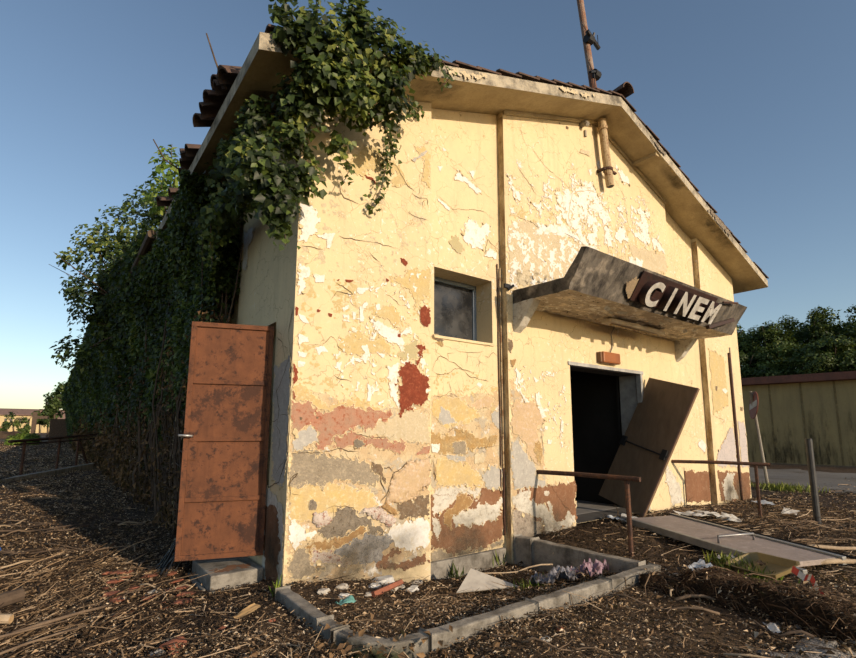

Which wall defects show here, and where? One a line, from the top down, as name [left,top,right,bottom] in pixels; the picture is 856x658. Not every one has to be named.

crack [377,153,539,228]
peeling [449,149,668,298]
peeling [708,348,729,415]
peeling [665,420,751,507]